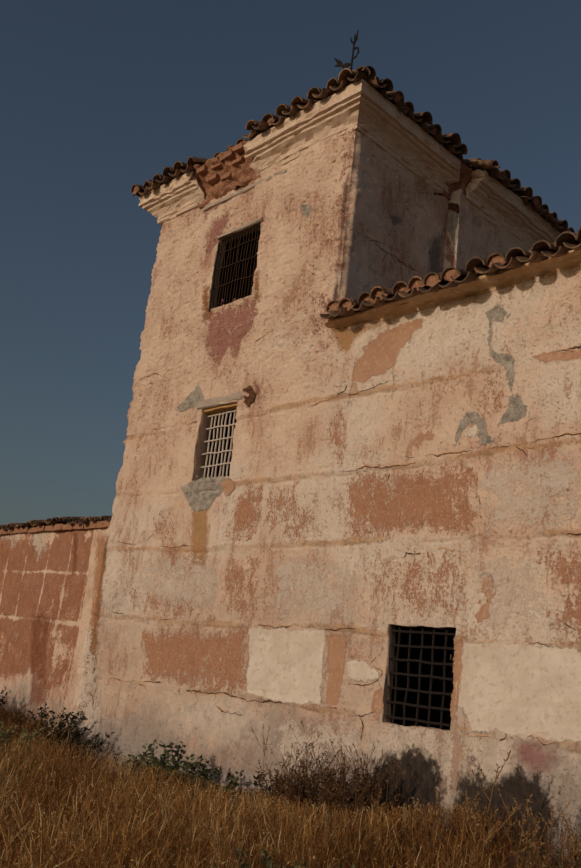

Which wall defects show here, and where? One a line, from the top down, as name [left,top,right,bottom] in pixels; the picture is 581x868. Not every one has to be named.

flaking render [196,142,245,185]
peeling [201,293,261,372]
peeling [348,318,422,383]
crack [553,345,581,353]
crack [311,380,389,406]
crack [342,431,581,479]
peeling [342,461,482,542]
peeling [125,477,316,703]
peeling [364,545,496,624]
peeling [536,544,581,642]
crack [105,657,384,750]
crack [468,733,581,745]